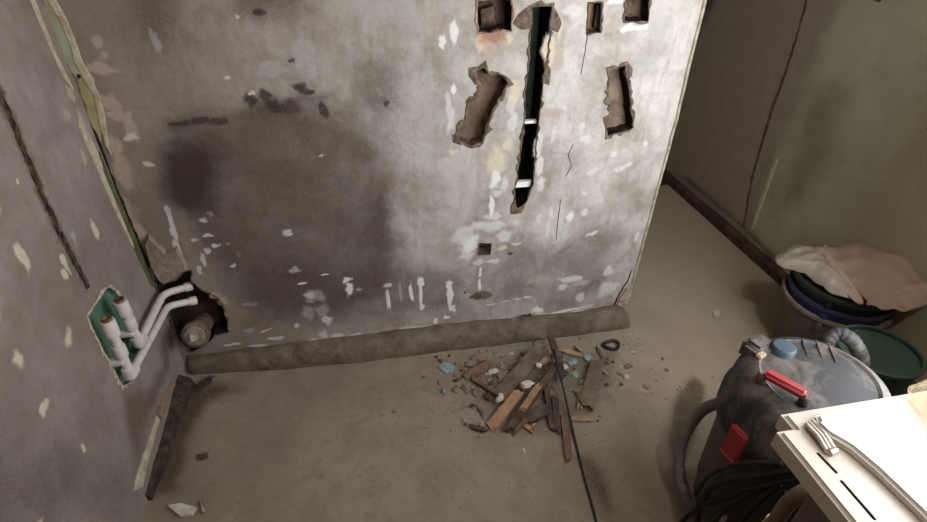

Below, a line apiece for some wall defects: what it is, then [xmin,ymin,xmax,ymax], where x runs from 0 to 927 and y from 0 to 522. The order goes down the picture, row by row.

leakage [697,0,719,46]
spalling [0,82,134,391]
crack [31,0,156,288]
flaking render [100,92,154,241]
flaking render [242,81,330,119]
flaking render [294,290,362,340]
leakage [142,33,659,341]
flaking render [463,255,633,318]
crack [743,0,808,228]
flaking render [39,397,50,418]